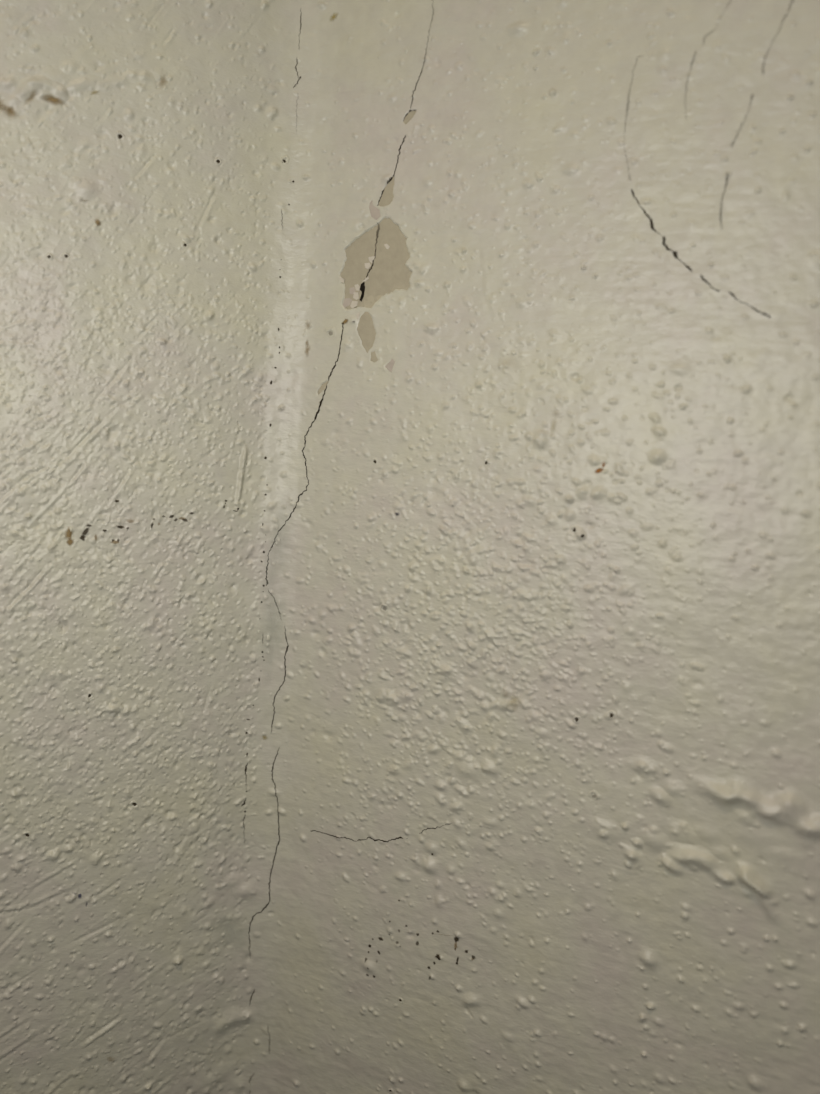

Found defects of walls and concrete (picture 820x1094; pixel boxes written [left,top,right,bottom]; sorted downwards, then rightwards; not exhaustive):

crack [377,135,406,206]
peeling [339,176,412,372]
crack [631,189,771,318]
crack [242,325,344,952]
crack [311,824,450,842]